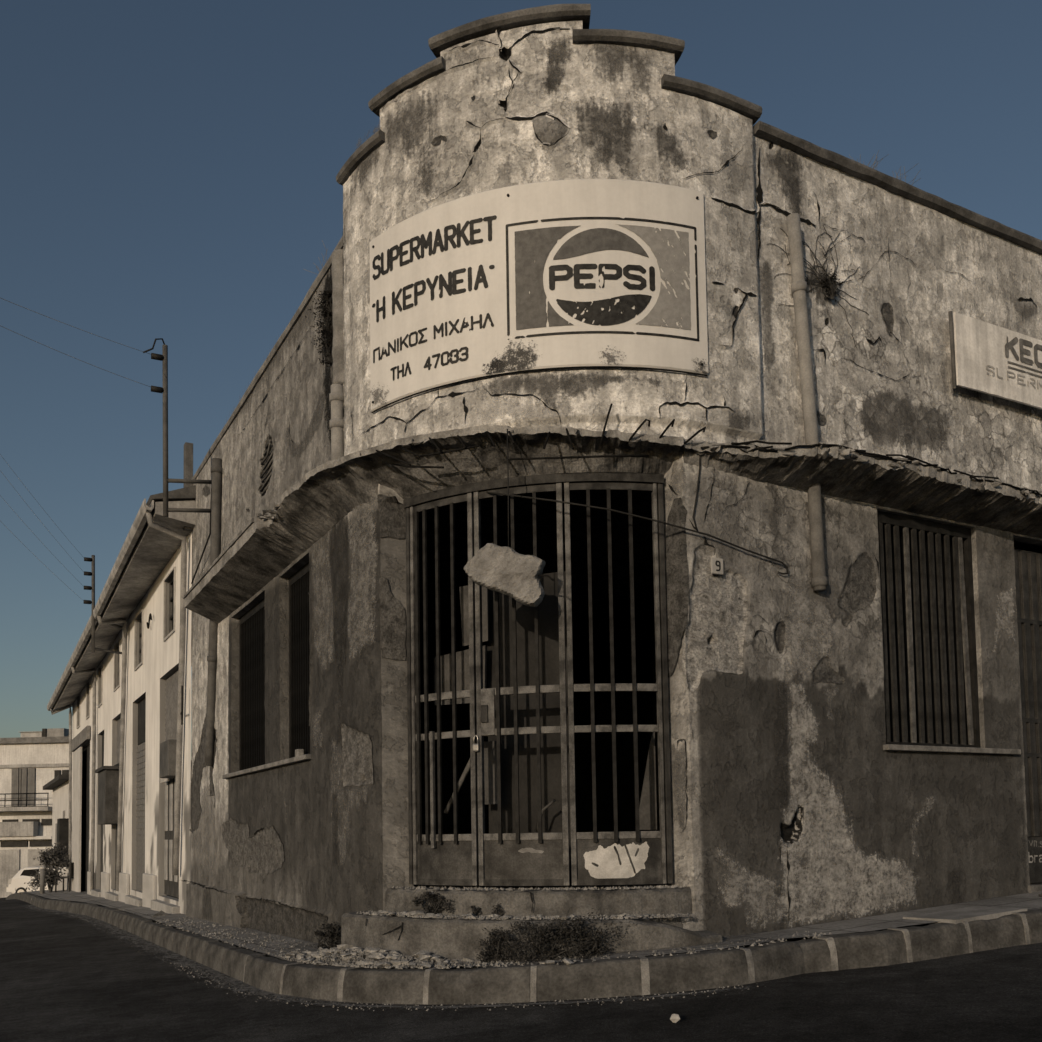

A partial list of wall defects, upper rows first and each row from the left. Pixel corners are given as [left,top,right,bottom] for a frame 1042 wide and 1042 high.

crack [382,27,572,203]
crack [678,144,970,387]
flaking render [189,717,217,832]
flaking render [222,818,285,879]
flaking render [312,714,374,863]
crack [780,850,791,924]
peeling [718,552,916,927]